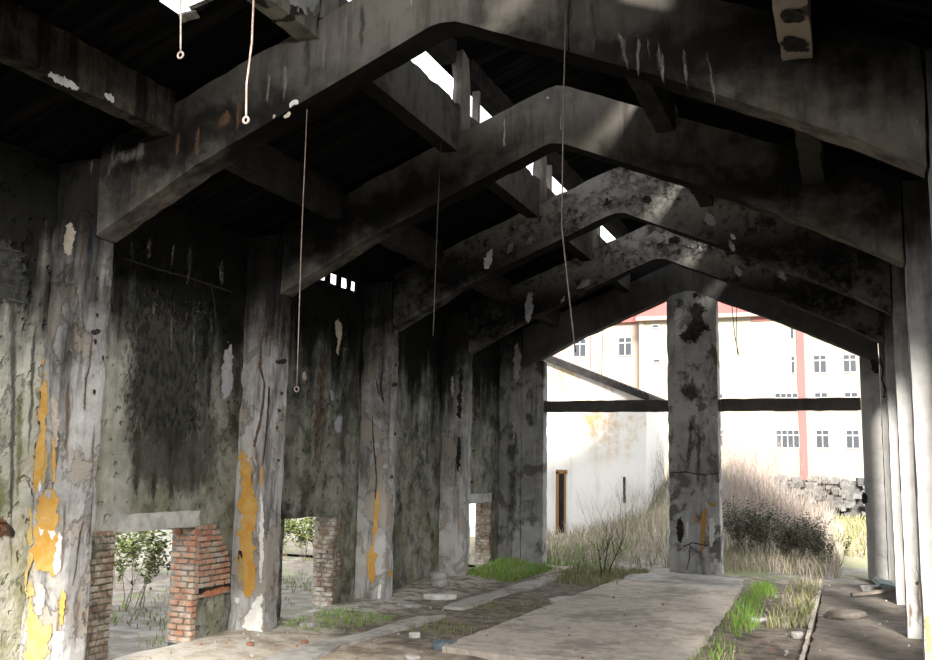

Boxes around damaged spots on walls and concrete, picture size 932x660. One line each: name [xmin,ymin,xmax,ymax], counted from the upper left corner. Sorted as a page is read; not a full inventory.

spalling [48,71,79,90]
flaking render [780,9,806,24]
flaking render [779,36,810,53]
leakage [124,284,218,500]
spalling [0,517,15,539]
peeling [23,358,66,660]
peeling [194,444,264,604]
peeling [366,491,382,599]